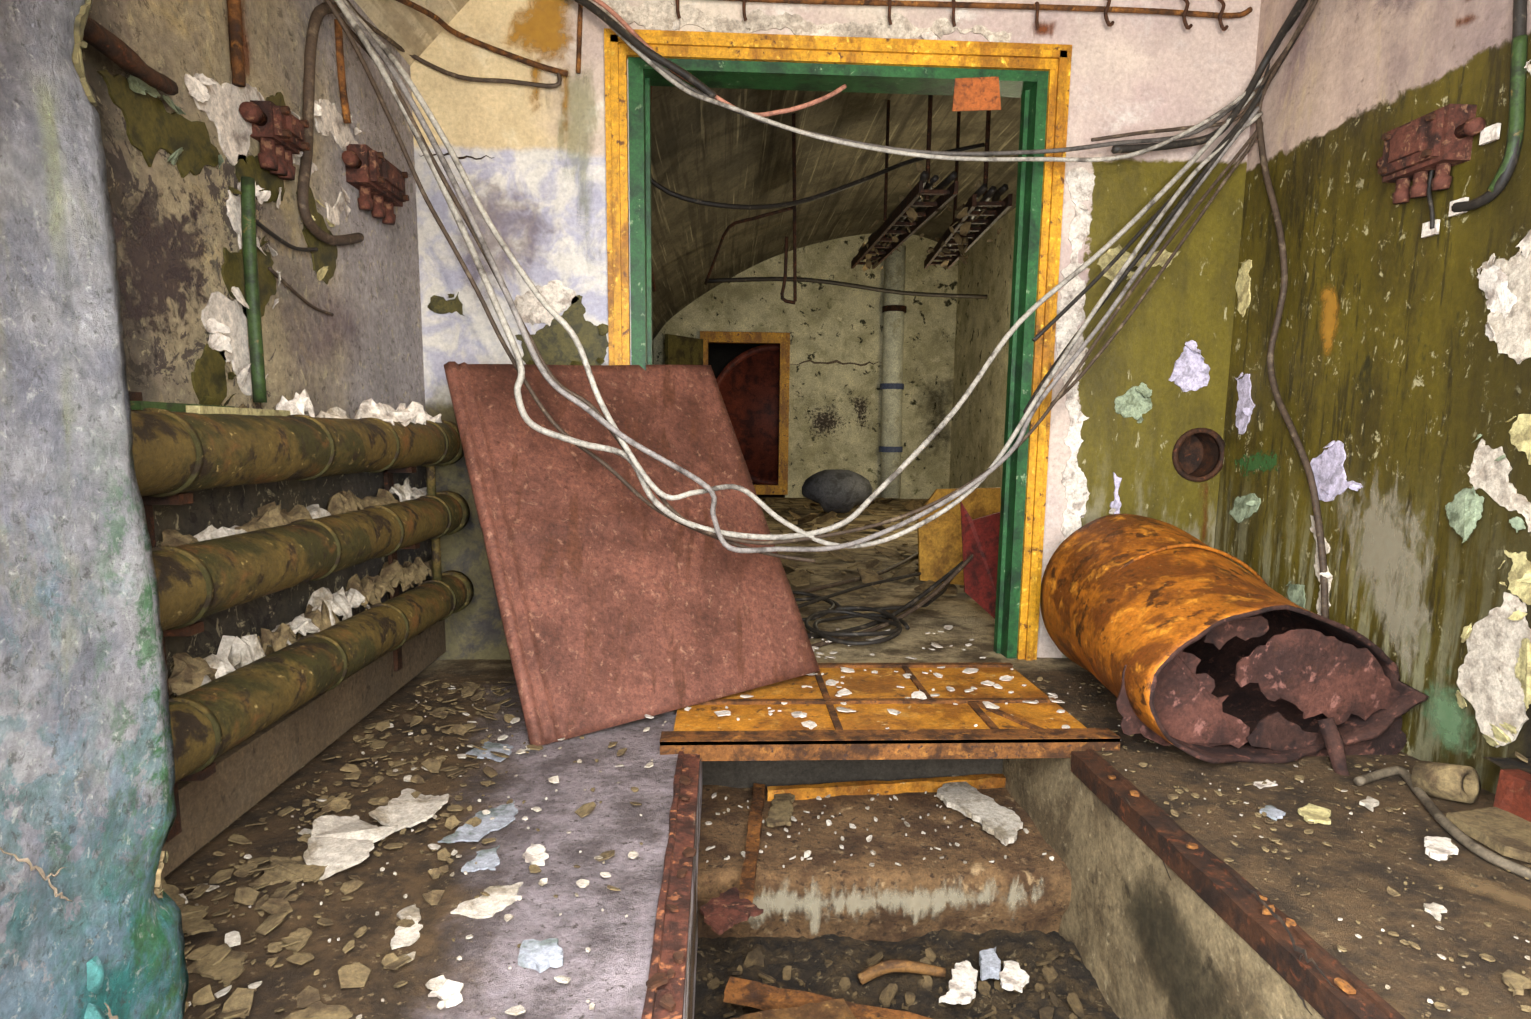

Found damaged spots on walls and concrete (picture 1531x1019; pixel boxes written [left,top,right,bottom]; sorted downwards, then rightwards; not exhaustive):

peeling [72,0,362,406]
peeling [1055,166,1180,544]
peeling [1168,340,1210,392]
peeling [1235,372,1255,434]
peeling [1286,440,1363,616]
peeling [1445,414,1531,543]
peeling [1477,230,1531,364]
peeling [1455,550,1531,748]